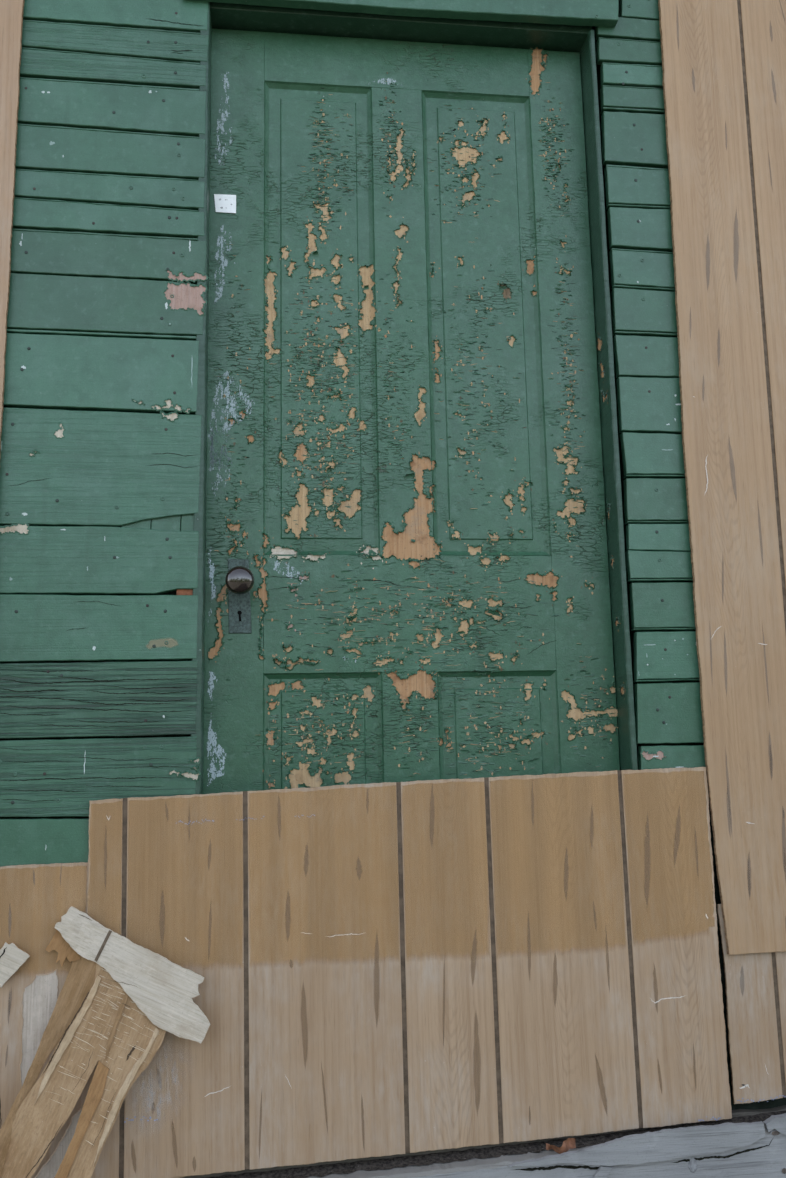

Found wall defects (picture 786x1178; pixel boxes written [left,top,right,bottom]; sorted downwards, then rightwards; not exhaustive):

peeling [526,47,549,96]
peeling [382,128,416,203]
peeling [438,112,511,209]
peeling [163,268,209,316]
peeling [131,398,192,422]
crack [214,72,616,789]
peeling [224,200,534,790]
peeling [552,426,587,542]
peeling [519,569,595,616]
peeling [494,676,625,759]
crack [515,1164,599,1172]
crack [673,1139,773,1163]